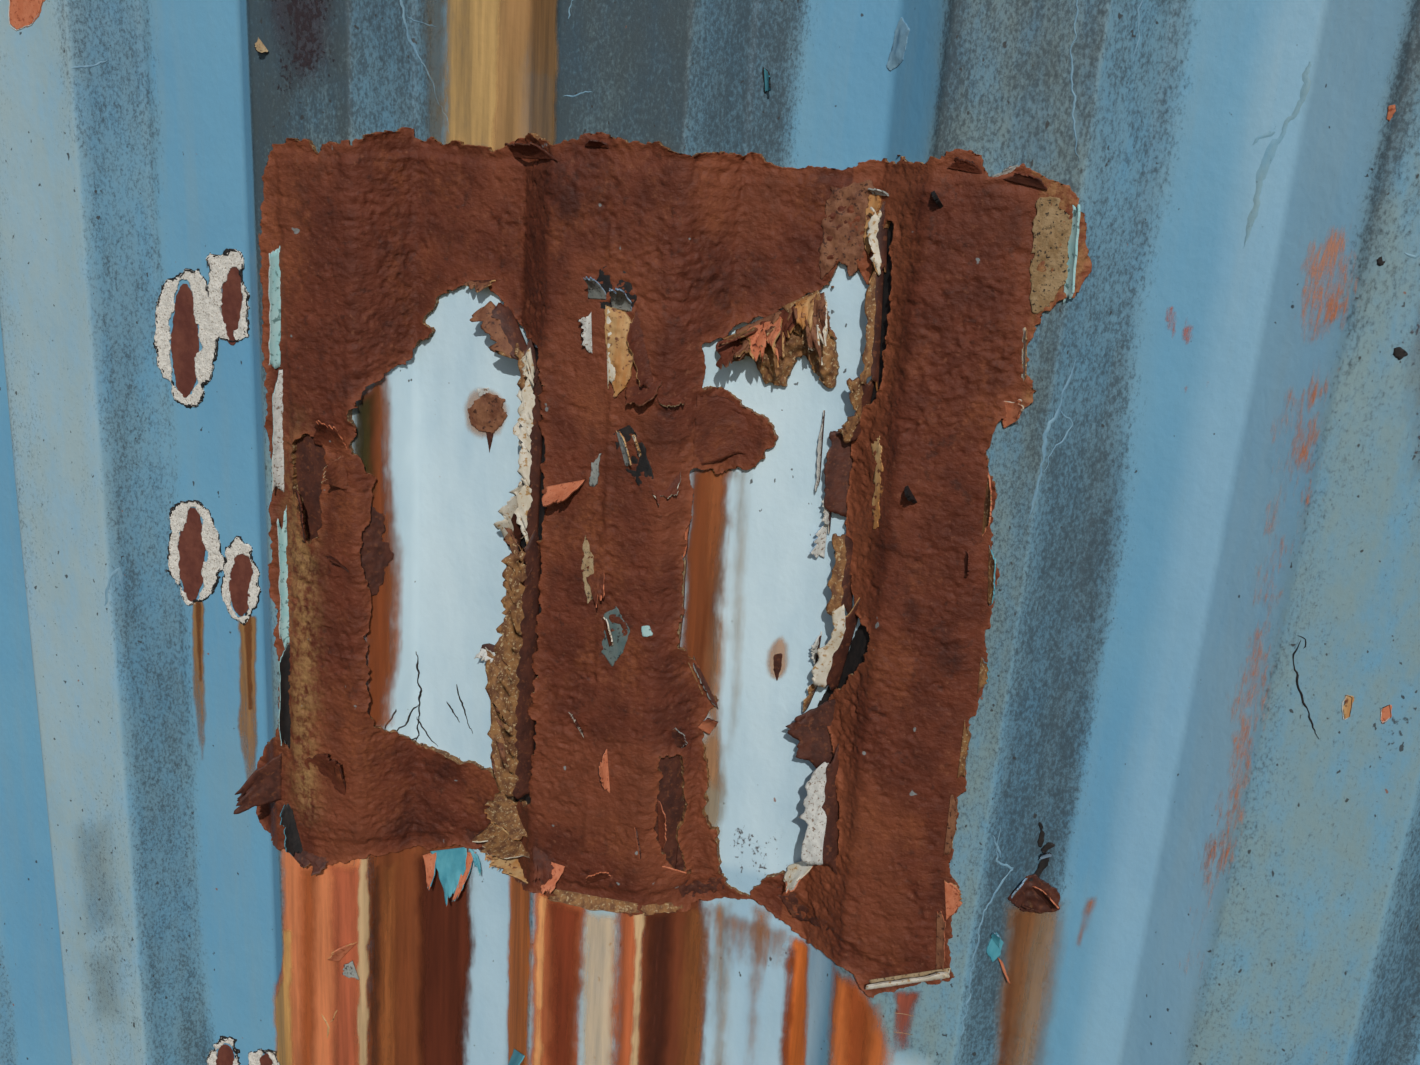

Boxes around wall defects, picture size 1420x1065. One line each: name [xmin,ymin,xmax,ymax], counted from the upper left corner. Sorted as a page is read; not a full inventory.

corrosion [467,387,508,453]
corrosion [354,382,397,727]
peeling [233,127,1092,998]
corrosion [682,468,728,827]
corrosion [769,640,785,680]
crack [1292,635,1318,737]
corrosion [216,1044,234,1065]
corrosion [260,845,472,1065]
corrosion [508,876,585,1065]
corrosion [612,900,776,1065]
corrosion [782,939,808,1065]
corrosion [830,974,918,1065]